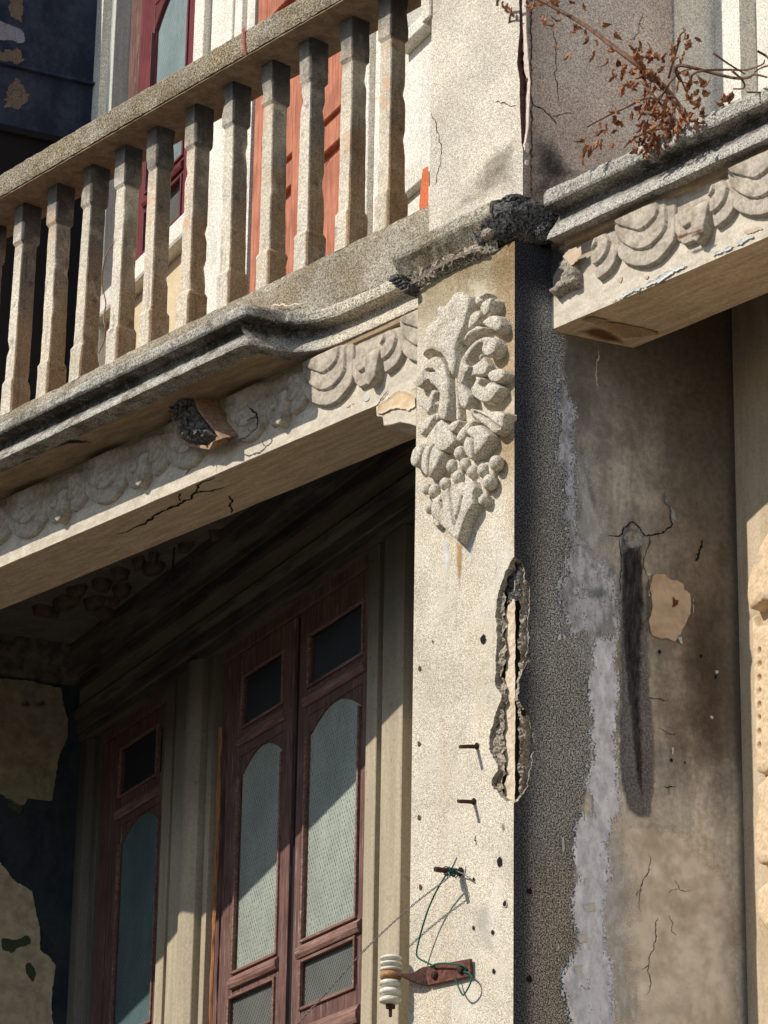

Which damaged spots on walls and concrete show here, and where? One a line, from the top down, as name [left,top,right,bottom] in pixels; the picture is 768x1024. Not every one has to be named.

crack [496,0,572,197]
spalling [389,193,559,299]
crack [114,398,234,535]
peeling [346,390,415,414]
crack [605,513,673,616]
peeling [0,678,68,814]
spalling [489,556,534,803]
water stain [621,539,654,817]
peeling [554,359,739,1024]
peeling [0,863,56,1024]